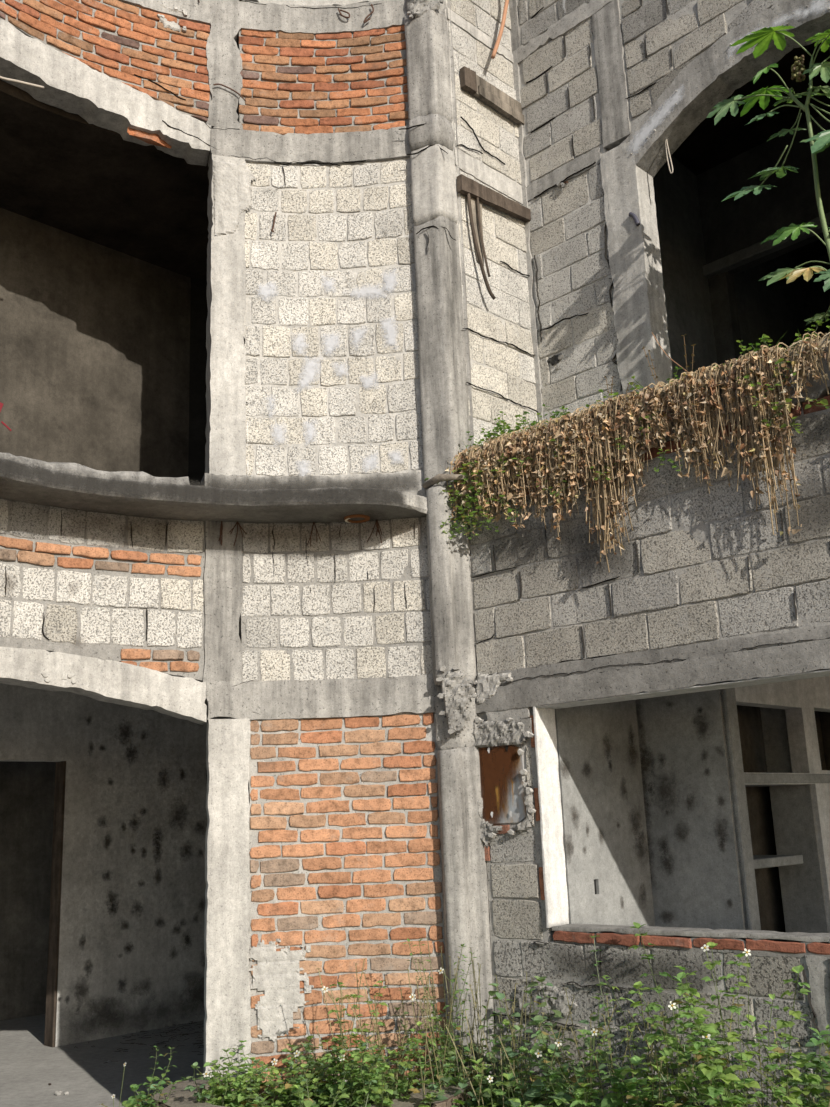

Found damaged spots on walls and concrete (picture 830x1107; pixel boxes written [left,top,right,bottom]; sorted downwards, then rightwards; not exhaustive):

spalling [407,0,444,19]
spalling [436,665,534,756]
corrosion [478,745,518,824]
spalling [477,769,536,848]
mould [629,707,672,873]
leakage [74,977,204,1031]
flaking render [249,939,314,1042]